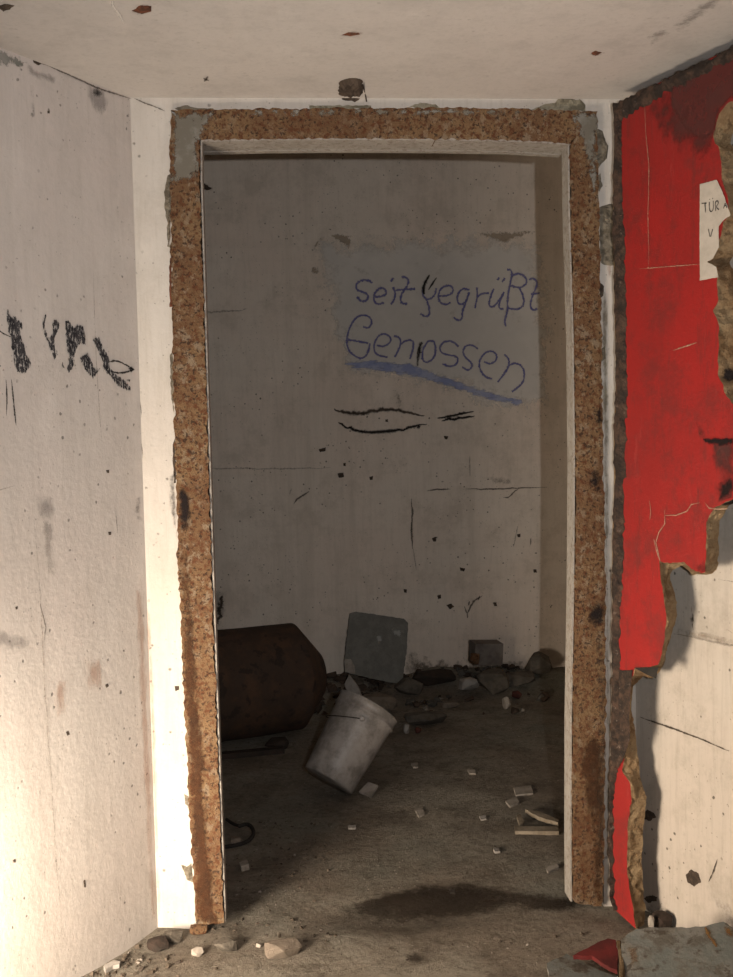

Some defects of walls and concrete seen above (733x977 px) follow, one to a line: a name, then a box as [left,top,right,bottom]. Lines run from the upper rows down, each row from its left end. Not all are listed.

corrosion [132,5,151,14]
spalling [597,129,608,191]
spalling [599,204,614,266]
spalling [686,861,717,886]
damp [345,883,575,923]